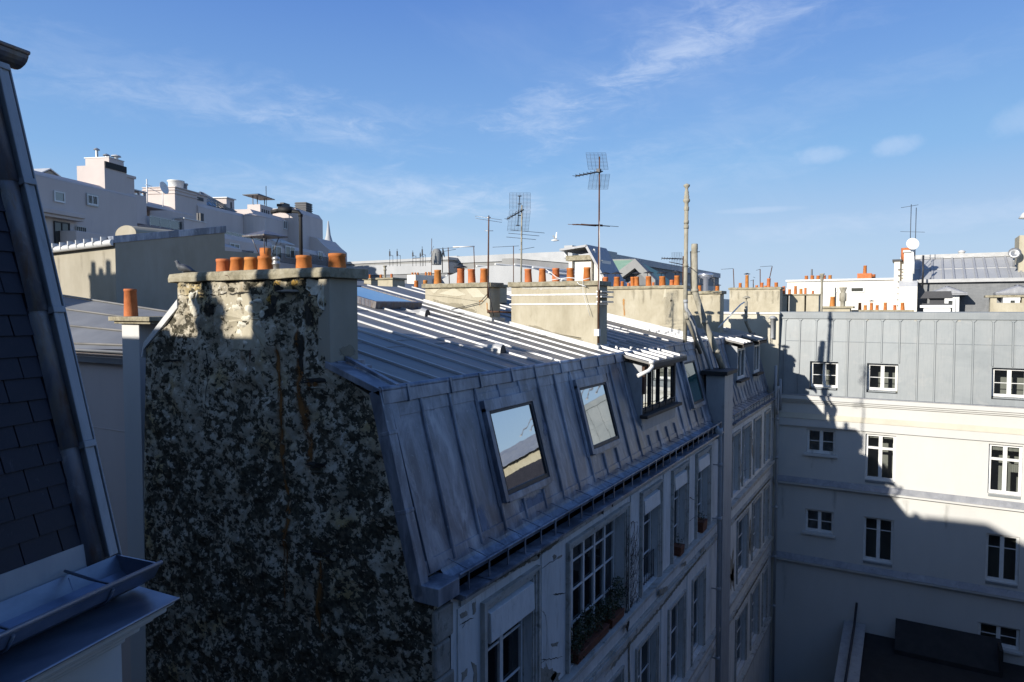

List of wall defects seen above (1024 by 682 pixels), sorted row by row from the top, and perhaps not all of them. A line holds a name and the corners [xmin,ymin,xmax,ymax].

leakage [259,295,277,318]
leakage [294,332,304,373]
corrosion [275,346,291,603]